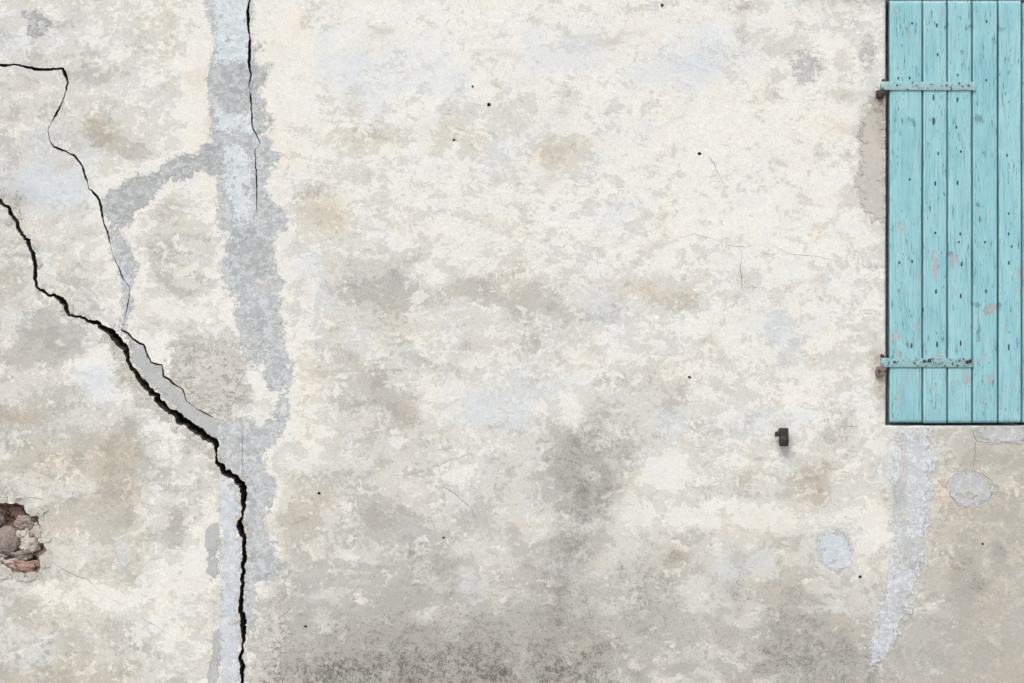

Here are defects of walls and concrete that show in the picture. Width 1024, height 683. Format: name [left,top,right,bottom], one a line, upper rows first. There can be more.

crack [246,0,260,212]
crack [0,64,252,683]
flaking render [0,492,53,582]
peeling [815,527,862,579]